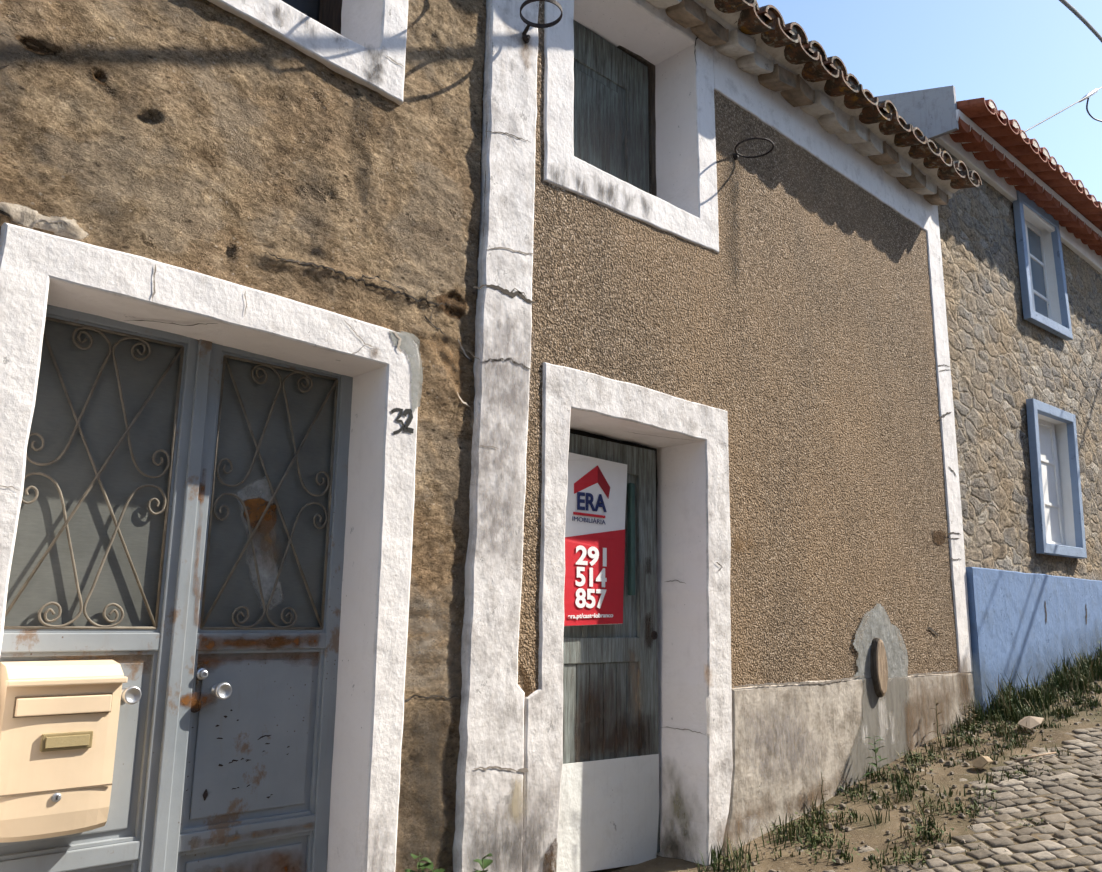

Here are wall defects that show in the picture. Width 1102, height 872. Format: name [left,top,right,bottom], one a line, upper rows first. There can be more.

water stain [369,50,382,81]
water stain [578,178,630,203]
peeling [0,202,88,239]
crack [267,251,536,370]
spalling [436,289,467,320]
peeling [389,331,423,412]
rust [243,498,276,558]
rust [197,635,319,668]
rust [180,683,214,707]
spalling [520,664,533,697]
crack [474,765,529,773]